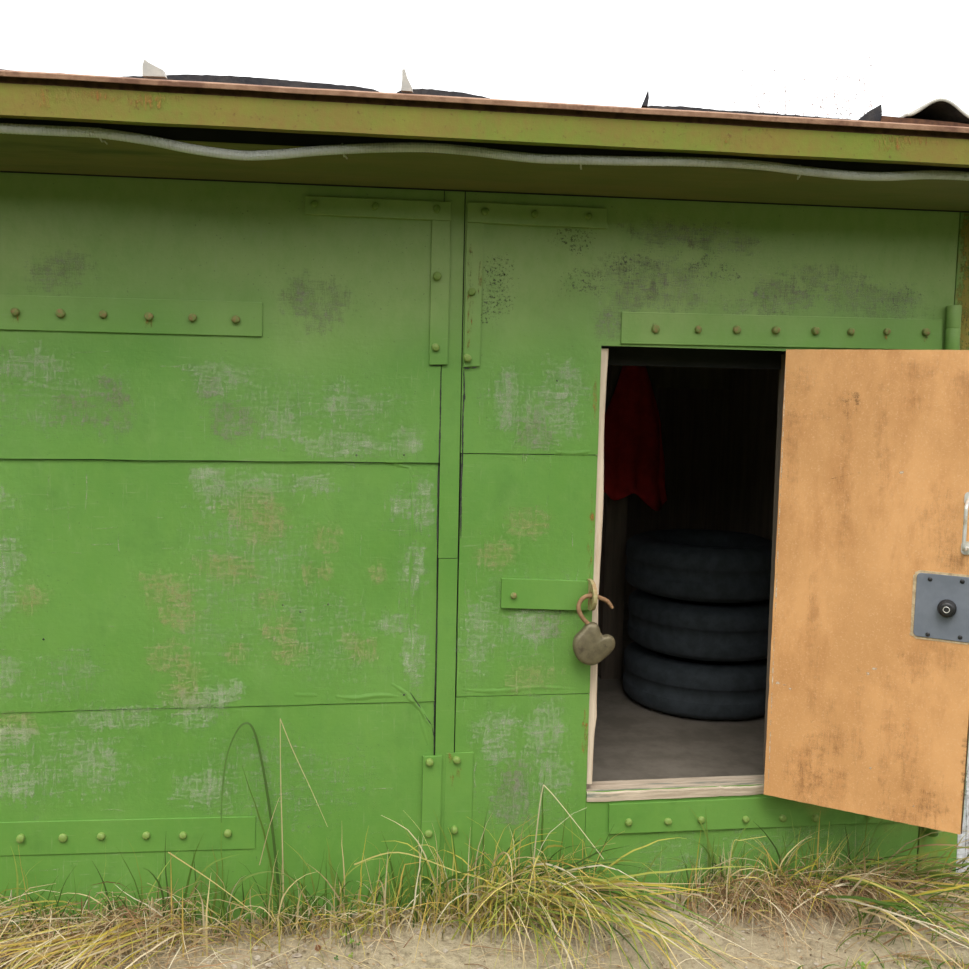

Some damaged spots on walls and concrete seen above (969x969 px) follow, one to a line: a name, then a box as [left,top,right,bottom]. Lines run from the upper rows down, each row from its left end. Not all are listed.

corrosion [957,214,969,350]